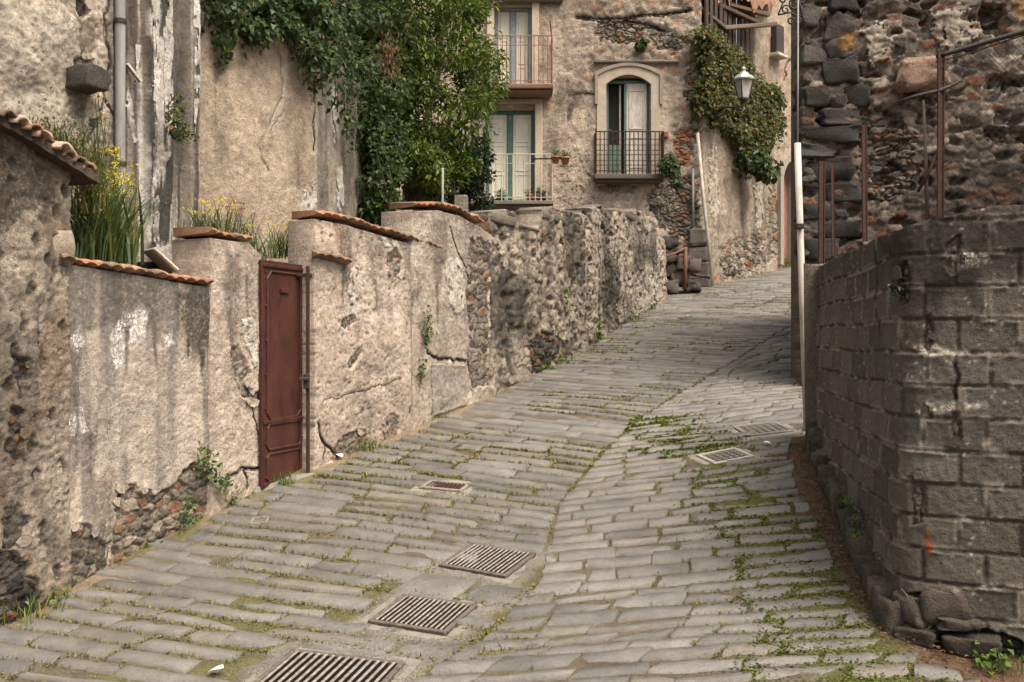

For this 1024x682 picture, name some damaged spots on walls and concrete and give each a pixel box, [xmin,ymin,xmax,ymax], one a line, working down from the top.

spalling [594,19,686,55]
spalling [647,58,721,238]
spalling [4,357,32,466]
water stain [61,268,96,451]
water stain [108,273,163,363]
water stain [177,291,210,374]
crack [317,378,399,458]
crack [424,343,470,371]
crack [953,356,961,399]
crack [224,466,259,489]
spalling [0,507,42,626]
spalling [70,463,209,587]